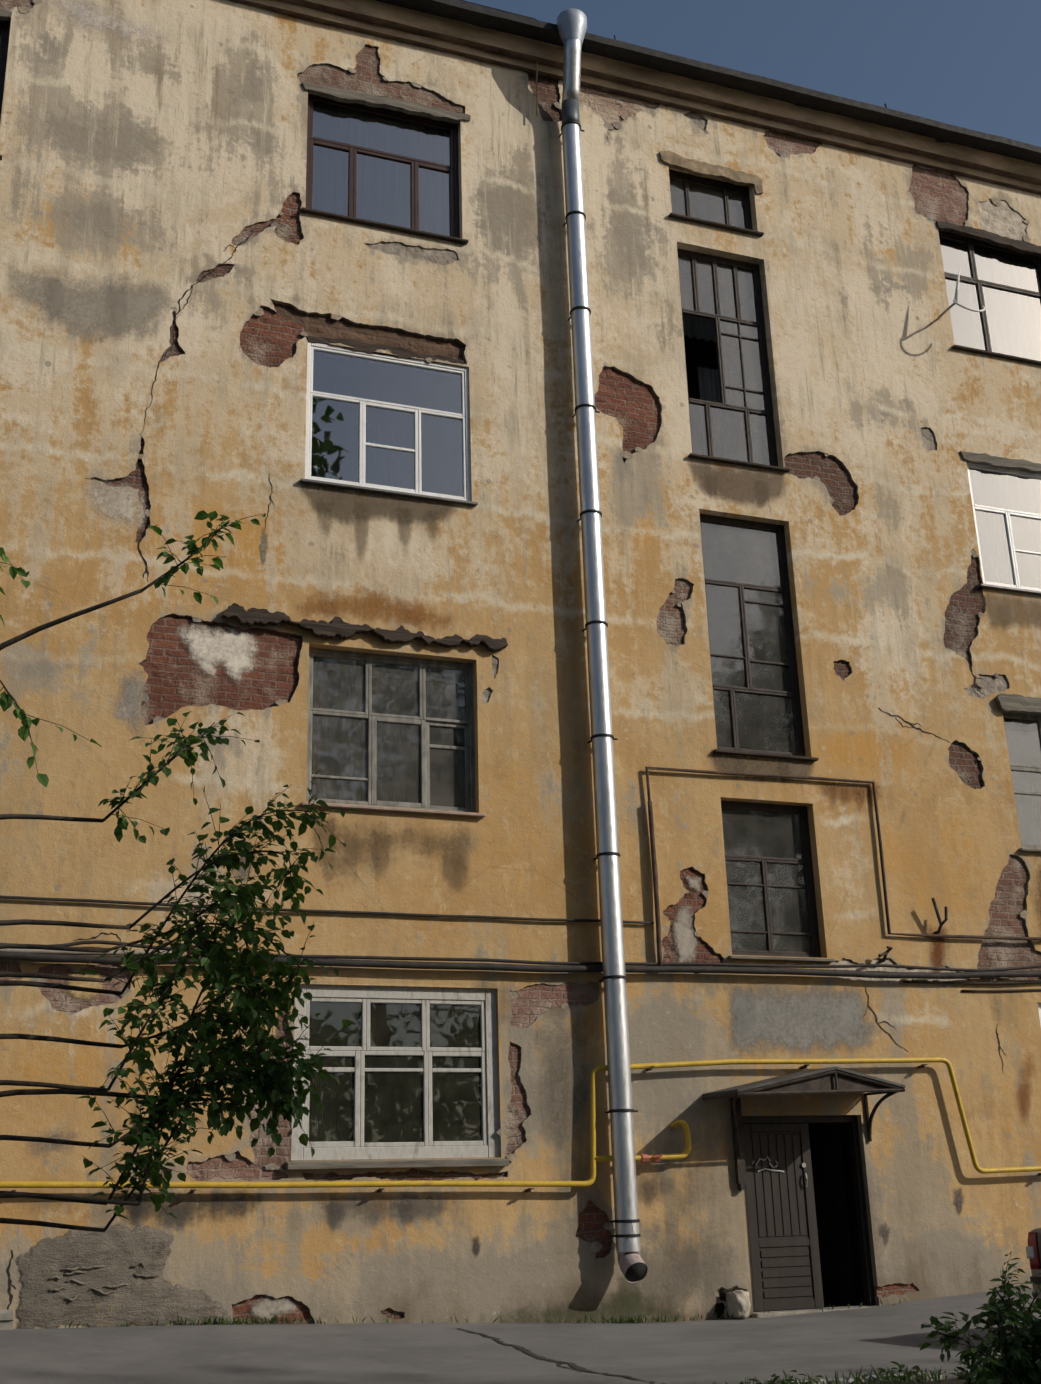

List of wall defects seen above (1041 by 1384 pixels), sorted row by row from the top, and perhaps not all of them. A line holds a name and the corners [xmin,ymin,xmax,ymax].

flaking render [297,46,465,114]
crack [140,220,277,442]
flaking render [240,308,308,368]
flaking render [595,367,661,463]
flaking render [784,452,858,515]
crack [137,542,149,580]
flaking render [115,615,302,727]
flaking render [943,550,1009,699]
flaking render [0,962,132,1015]
crack [863,990,907,1051]
peeling [731,855,1041,1053]
flaking render [159,982,599,1181]